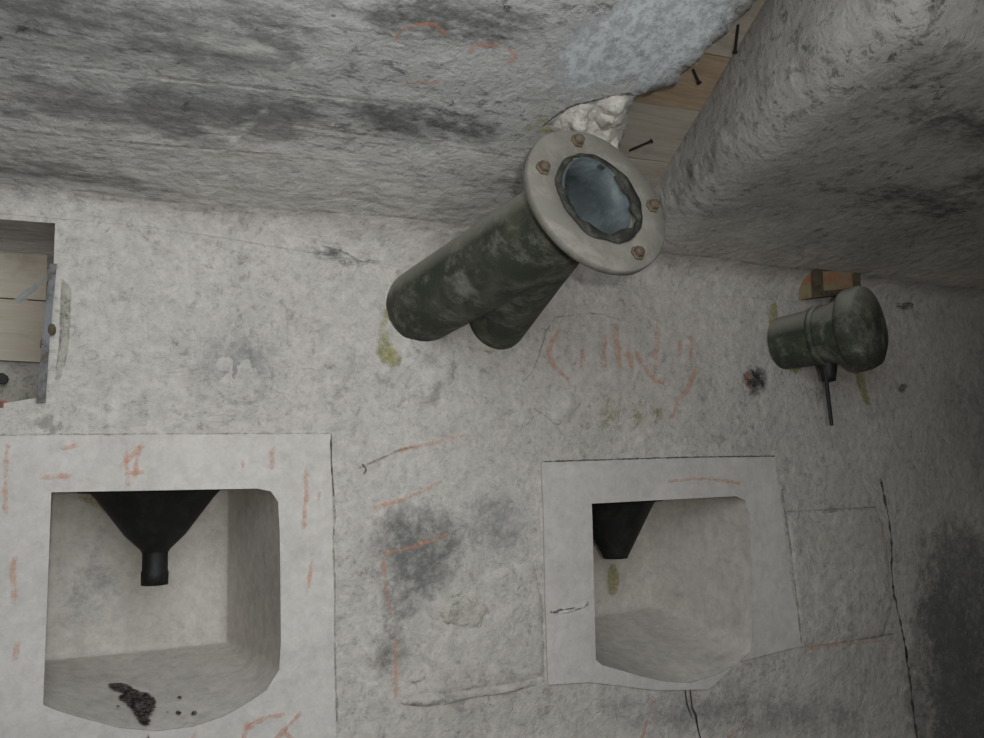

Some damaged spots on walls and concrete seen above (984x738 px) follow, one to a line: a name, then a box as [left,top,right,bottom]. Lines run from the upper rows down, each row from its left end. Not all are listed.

spalling [553,94,628,149]
damp [388,518,455,599]
crack [880,481,918,738]
damp [913,531,984,738]